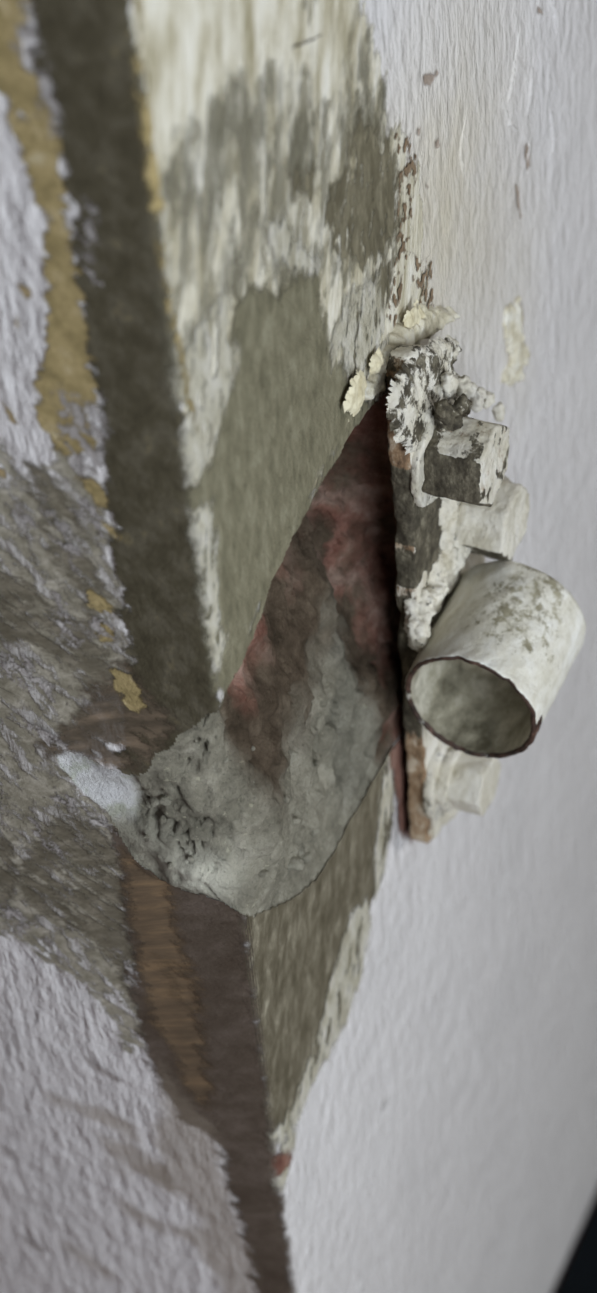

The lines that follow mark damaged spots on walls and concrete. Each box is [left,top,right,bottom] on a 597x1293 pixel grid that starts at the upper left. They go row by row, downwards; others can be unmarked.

peeling [18,284,32,299]
spalling [22,0,460,1293]
corrosion [389,735,412,842]
corrosion [271,1152,292,1176]